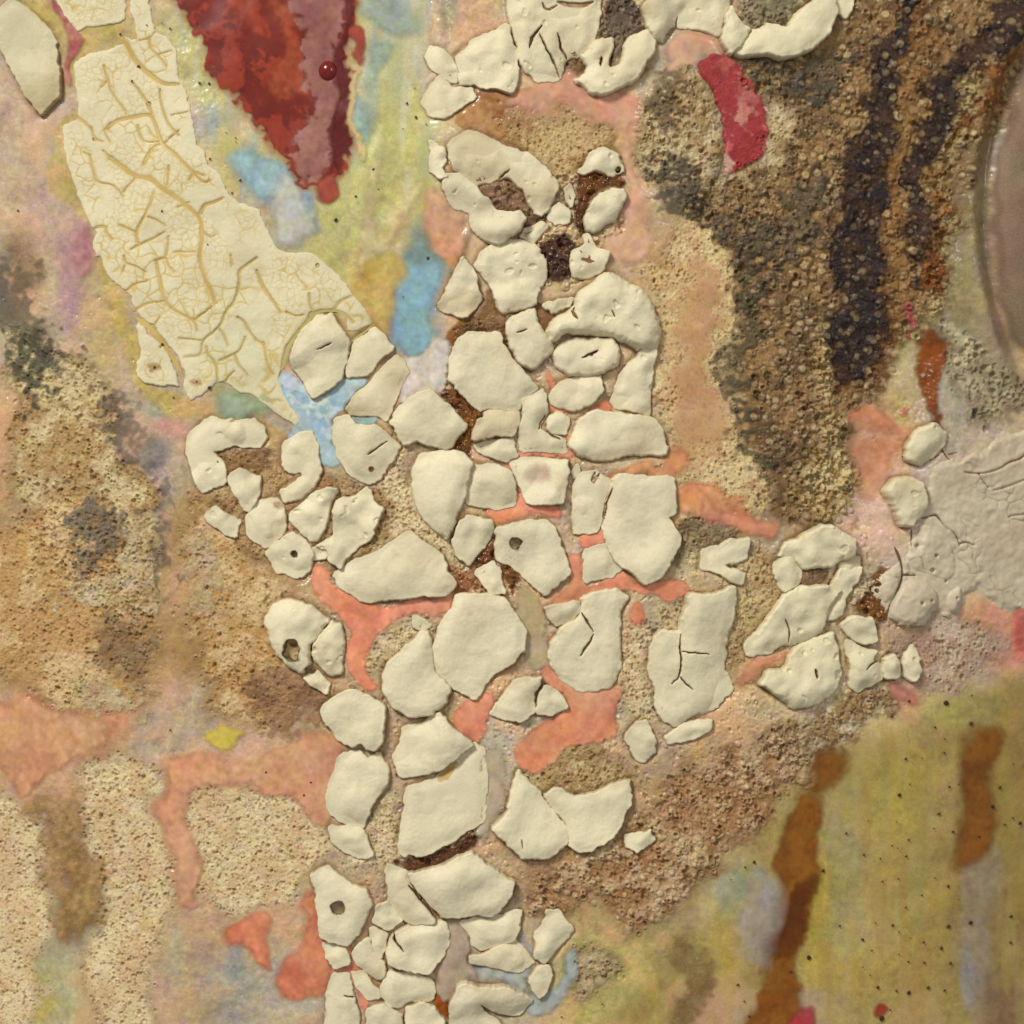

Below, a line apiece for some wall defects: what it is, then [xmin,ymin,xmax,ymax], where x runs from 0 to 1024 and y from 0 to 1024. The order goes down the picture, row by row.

peeling [420,0,855,120]
crack [75,36,374,384]
rust [916,330,947,424]
peeling [56,0,682,1024]
peeling [623,584,737,763]
peeling [743,523,923,710]
peeling [880,422,947,528]
crack [889,515,968,607]
crack [929,449,1024,488]
rust [956,729,1002,866]
rust [747,748,846,1024]